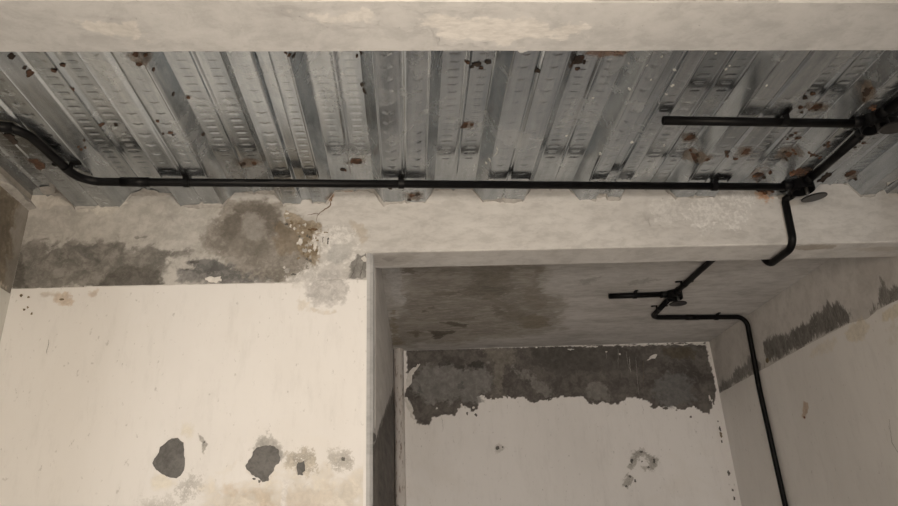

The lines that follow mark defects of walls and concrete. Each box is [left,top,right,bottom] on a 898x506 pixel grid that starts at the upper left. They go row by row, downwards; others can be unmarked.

rust [129,52,155,72]
rust [570,51,625,71]
rust [798,93,827,114]
rust [682,133,712,163]
rust [725,147,752,160]
rust [775,132,831,177]
flaking render [279,207,329,262]
leakage [0,186,898,506]
peeling [404,364,420,420]
spalling [618,444,662,492]